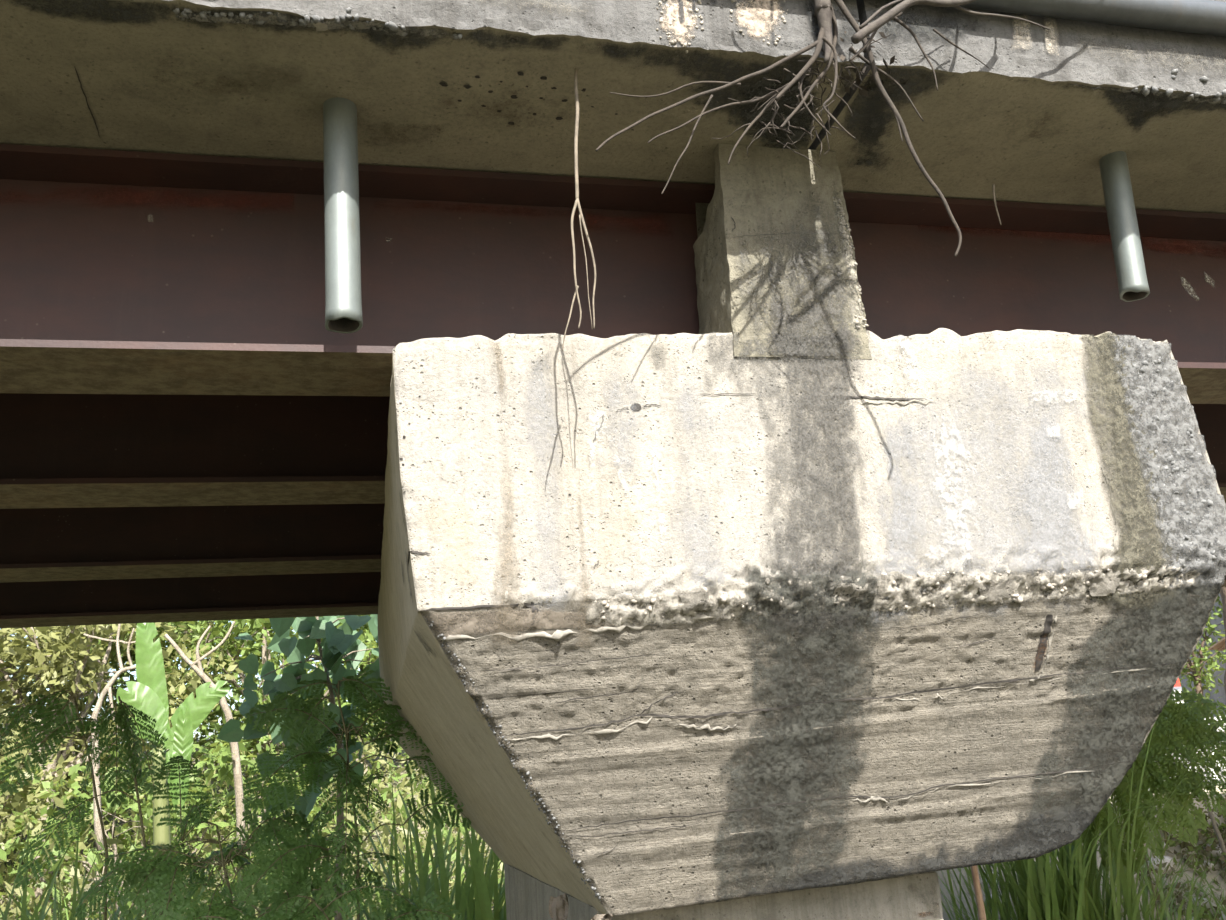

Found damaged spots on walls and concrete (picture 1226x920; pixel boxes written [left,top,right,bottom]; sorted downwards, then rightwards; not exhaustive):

leakage [12,0,316,32]
leakage [464,30,566,49]
spalling [656,0,716,59]
spalling [729,0,788,46]
leakage [807,4,820,37]
leakage [601,44,816,149]
leakage [842,65,943,167]
leakage [699,201,1225,904]
crack [889,615,994,651]
spalling [416,466,1201,904]
crack [469,653,1173,741]
crack [550,761,1133,856]